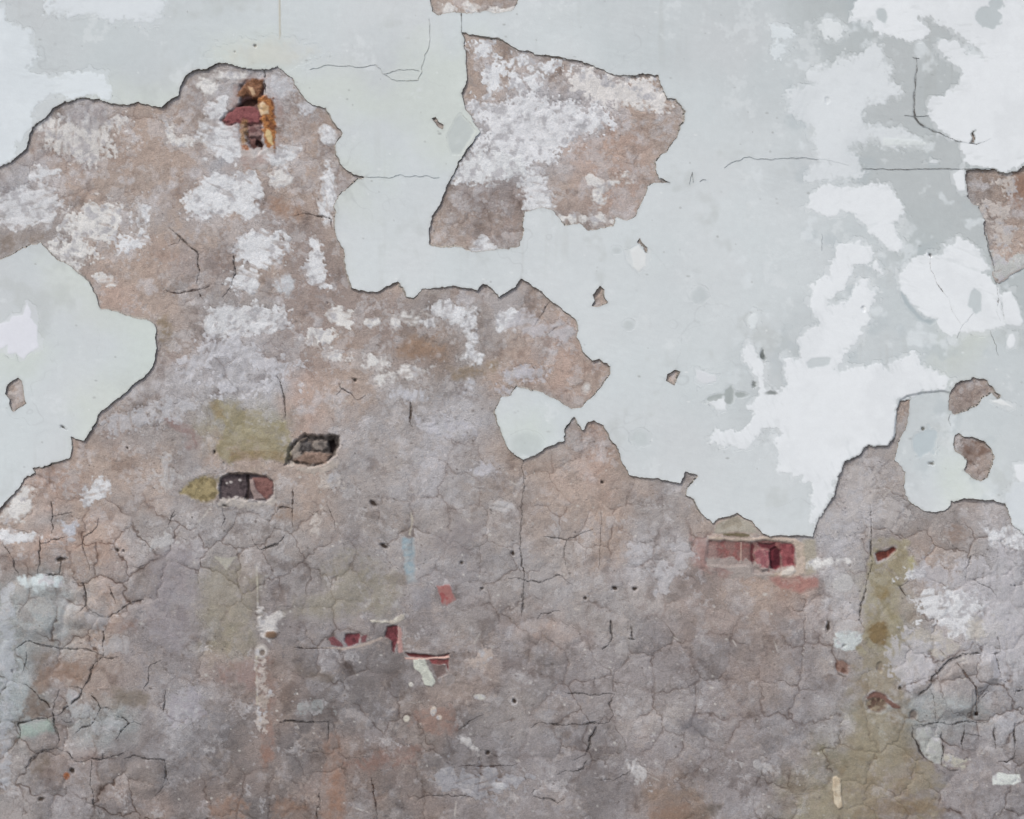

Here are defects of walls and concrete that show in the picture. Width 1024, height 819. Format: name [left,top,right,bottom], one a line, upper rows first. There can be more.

peeling [429,32,686,252]
peeling [781,0,1024,261]
crack [870,57,993,170]
damp [0,228,55,255]
damp [254,192,312,227]
damp [155,310,175,355]
damp [391,332,504,383]
peeling [700,233,1024,572]
crack [5,503,167,814]
crack [531,677,625,780]
peeling [898,579,1024,819]
crack [912,637,1021,771]